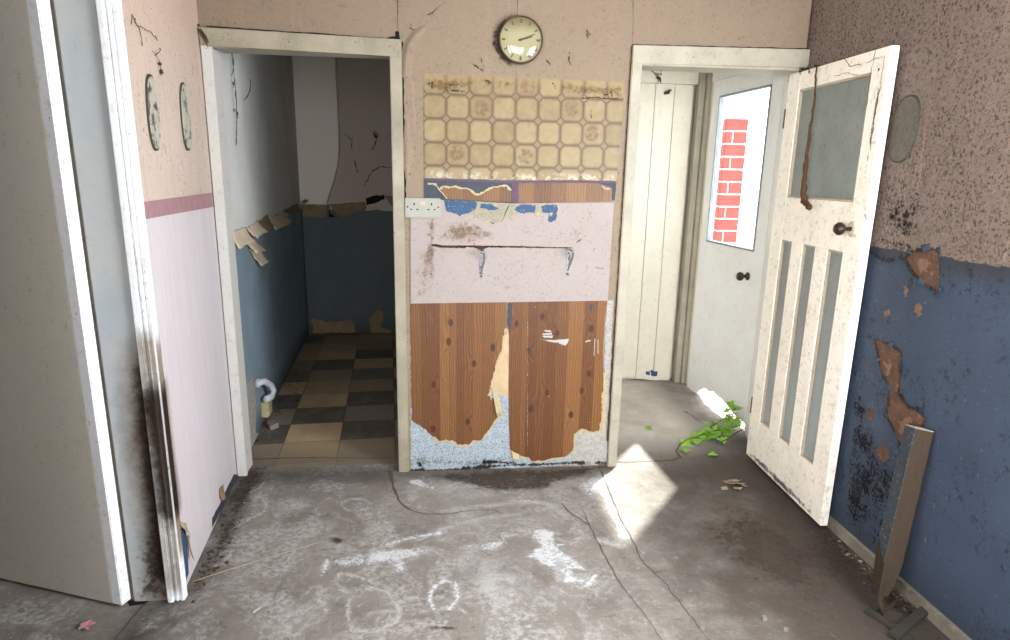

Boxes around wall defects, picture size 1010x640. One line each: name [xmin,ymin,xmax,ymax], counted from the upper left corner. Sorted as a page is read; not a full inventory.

peeling [444,200,558,224]
mould [877,193,919,248]
peeling [901,243,941,297]
flaking render [410,300,613,470]
peeling [866,335,926,462]
crack [387,470,502,514]
leakage [321,459,630,633]
crack [561,503,662,640]
crack [600,471,709,640]
mould [847,394,894,543]